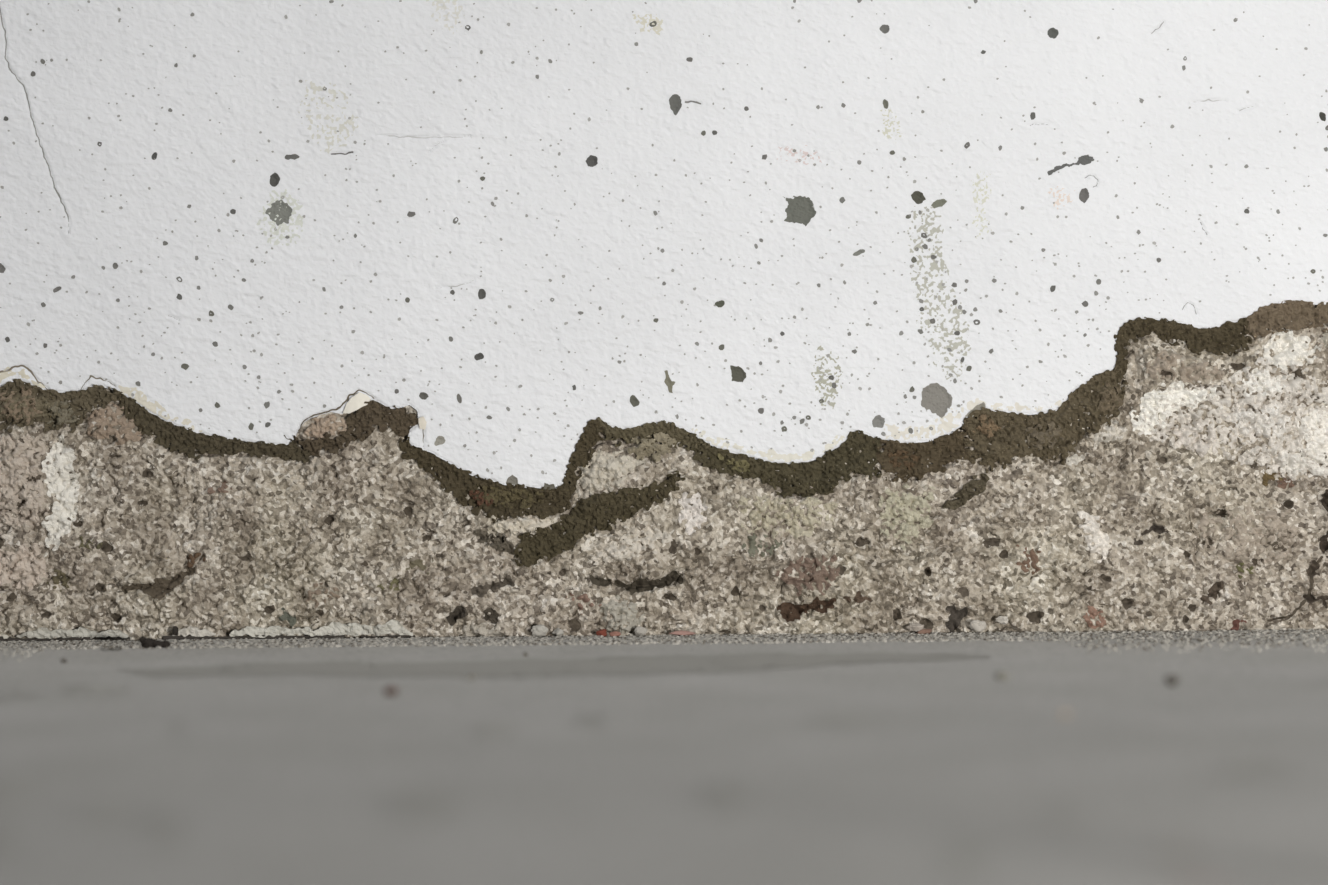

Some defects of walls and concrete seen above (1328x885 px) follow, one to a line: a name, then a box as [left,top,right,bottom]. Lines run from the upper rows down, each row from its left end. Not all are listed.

crack [0,9,69,233]
peeling [664,370,675,393]
peeling [730,365,746,382]
peeling [343,392,371,414]
peeling [921,383,952,418]
peeling [418,417,446,446]
peeling [872,415,885,428]
spalling [983,538,1008,559]
spalling [569,619,581,633]
spalling [919,618,933,629]
spalling [1026,611,1044,624]
spalling [1121,598,1152,617]